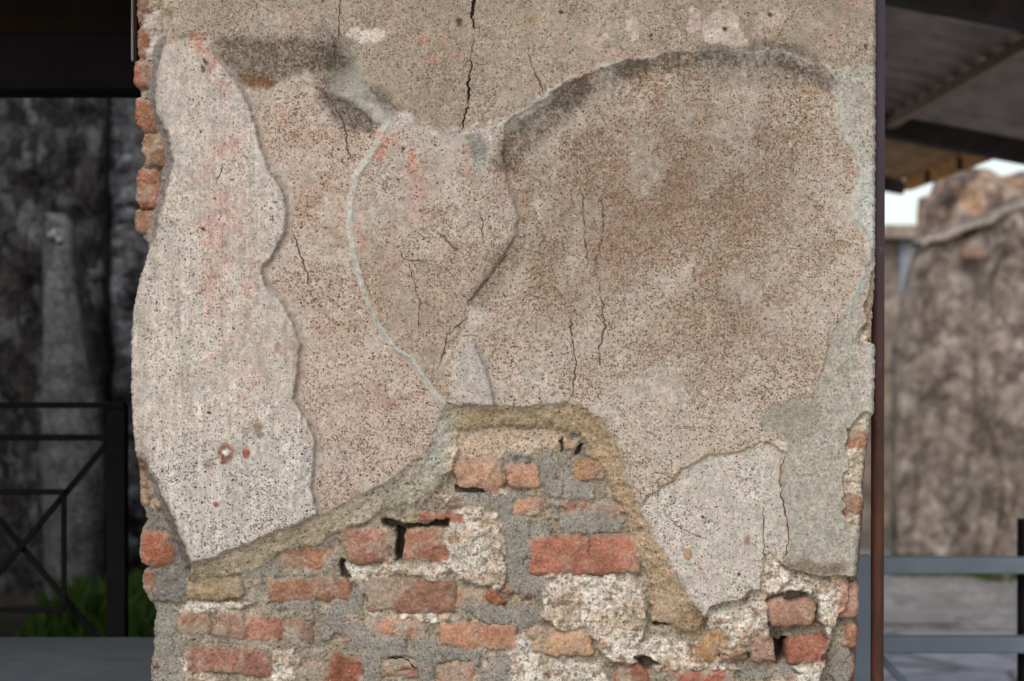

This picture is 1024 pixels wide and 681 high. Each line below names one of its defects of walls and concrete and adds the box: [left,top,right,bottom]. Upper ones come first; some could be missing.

damp [218,38,372,132]
crack [462,0,476,129]
damp [493,52,737,171]
damp [756,43,834,90]
peeling [133,0,875,681]
crack [570,190,607,396]
crack [762,456,789,557]